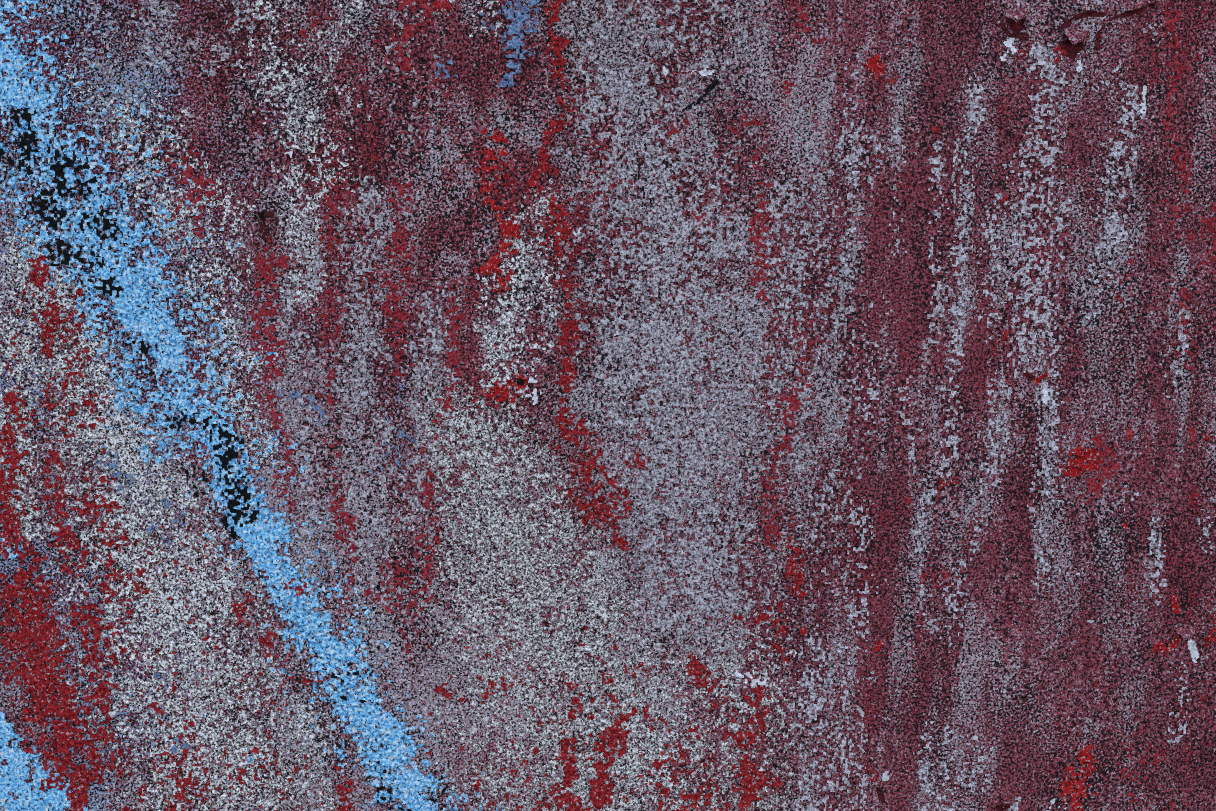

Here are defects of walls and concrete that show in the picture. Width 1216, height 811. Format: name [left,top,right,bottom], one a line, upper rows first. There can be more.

spalling [998,7,1089,75]